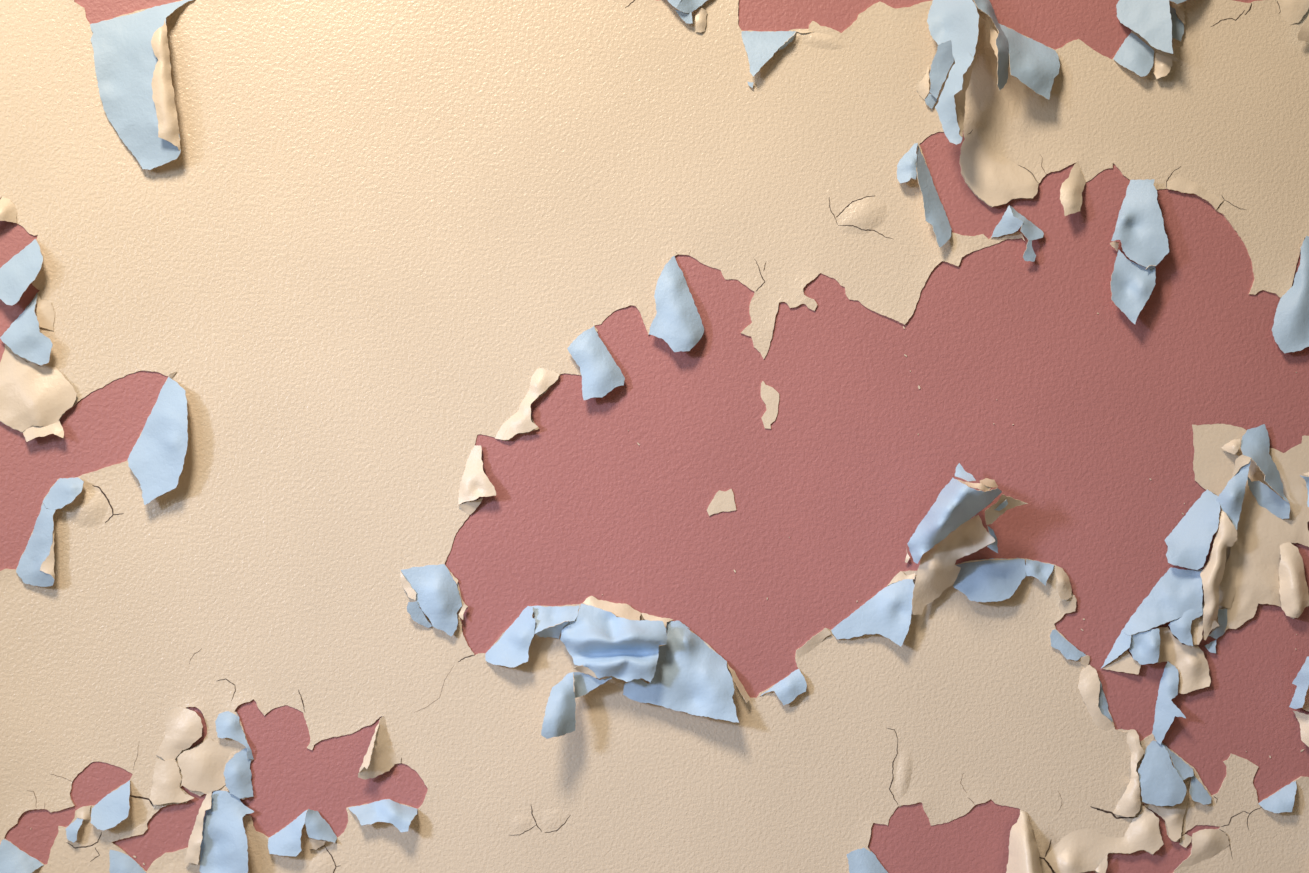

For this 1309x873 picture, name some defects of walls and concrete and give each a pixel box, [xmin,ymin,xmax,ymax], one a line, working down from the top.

peeling [75,0,193,170]
crack [829,196,892,239]
peeling [0,197,188,587]
peeling [400,0,1309,873]
peeling [0,699,428,873]